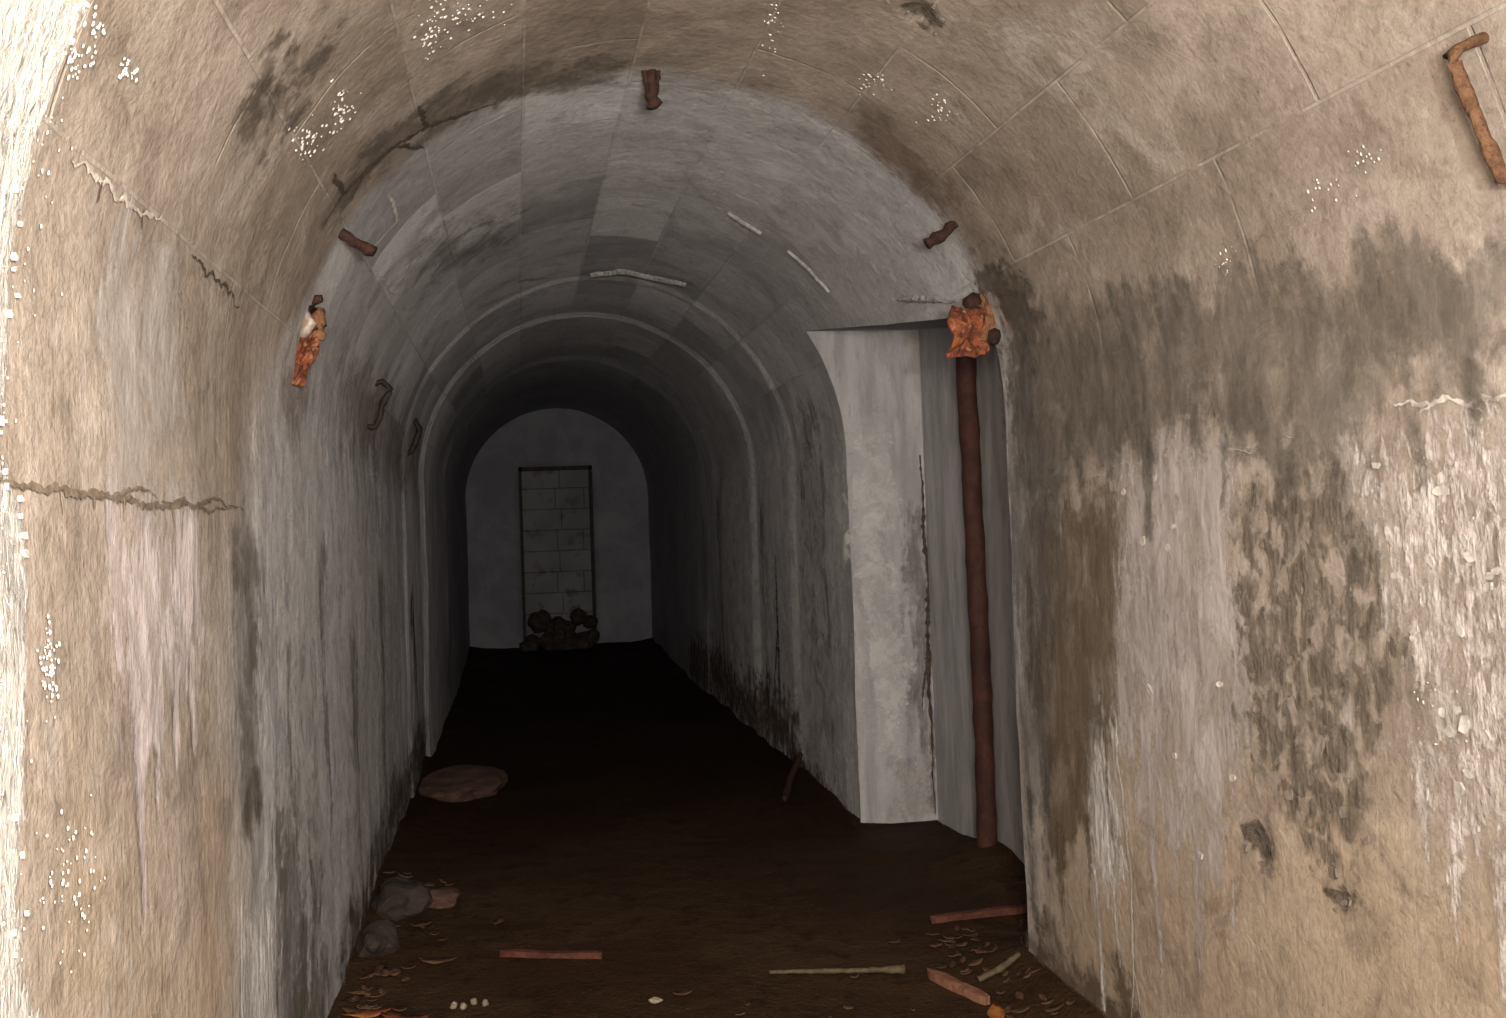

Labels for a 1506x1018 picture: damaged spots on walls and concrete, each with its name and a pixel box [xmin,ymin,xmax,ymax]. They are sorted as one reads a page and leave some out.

damp [276,34,335,75]
damp [237,67,310,143]
crack [72,160,162,229]
crack [192,254,239,308]
crack [0,477,244,527]
damp [96,207,204,921]
damp [975,236,1496,1011]
damp [233,408,399,1018]